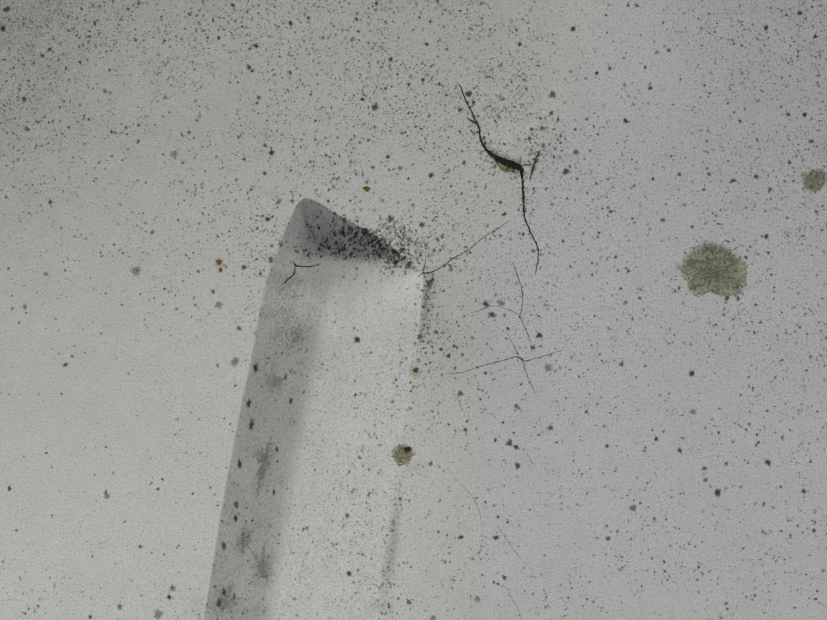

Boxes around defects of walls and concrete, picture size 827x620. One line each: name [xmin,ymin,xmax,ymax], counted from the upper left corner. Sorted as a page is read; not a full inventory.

crack [283,262,320,284]
crack [418,83,562,394]